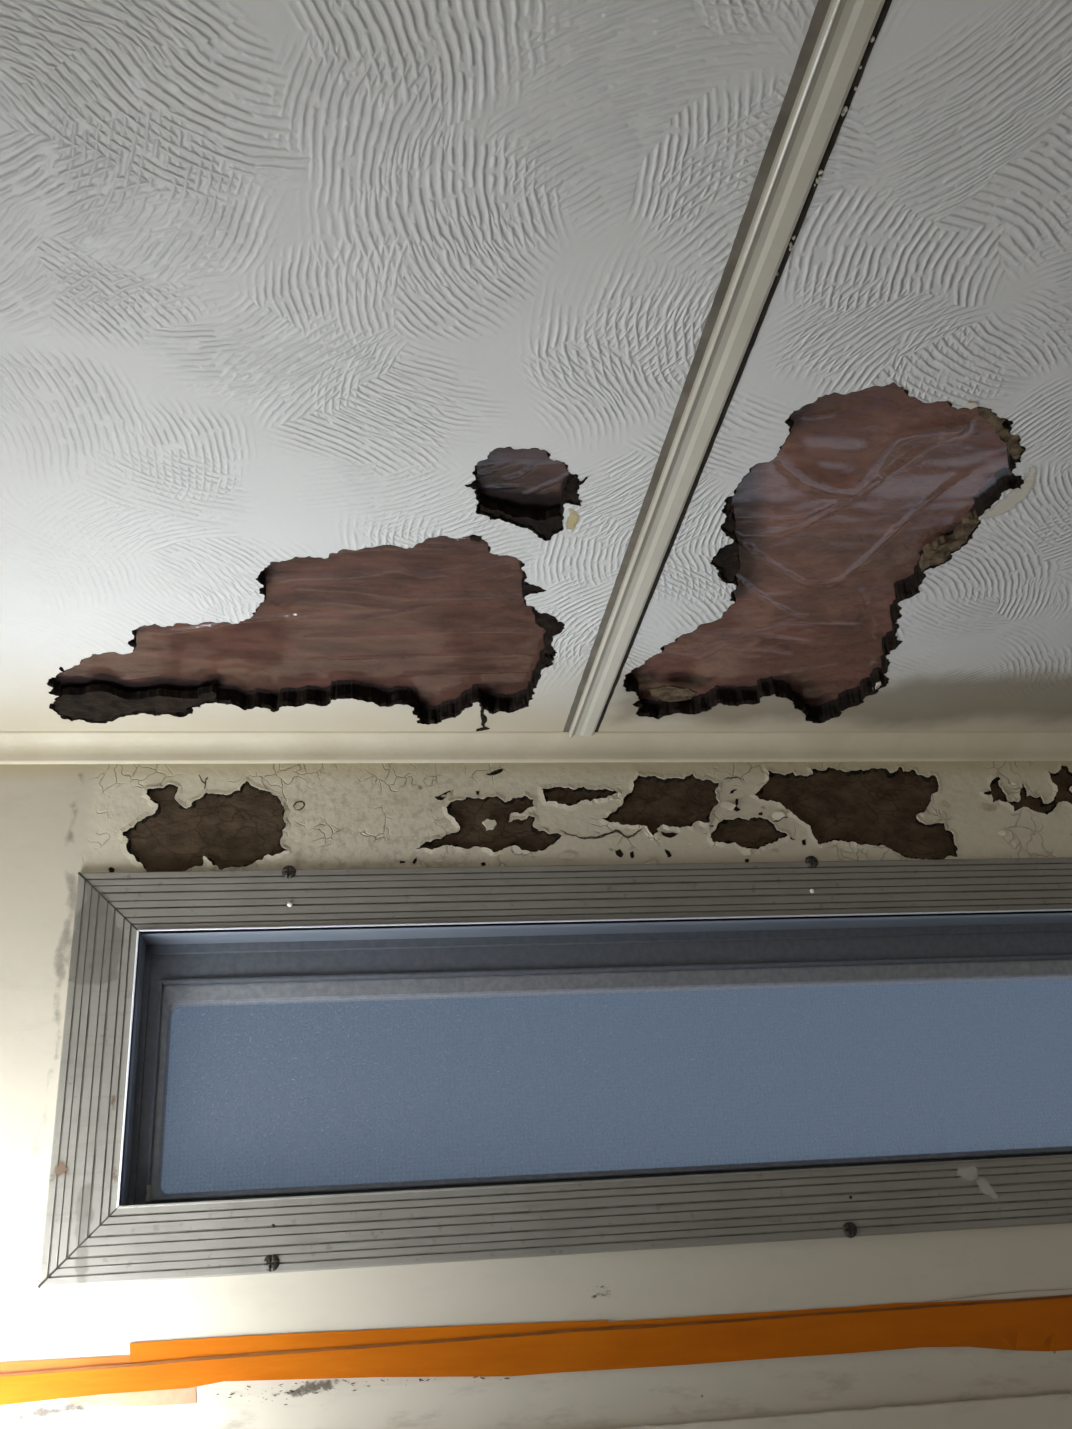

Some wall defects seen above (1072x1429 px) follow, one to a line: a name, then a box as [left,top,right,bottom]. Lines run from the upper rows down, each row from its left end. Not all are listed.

peeling [963,402,1024,460]
peeling [479,473,581,538]
peeling [713,497,740,582]
peeling [919,510,980,572]
peeling [521,578,564,665]
peeling [54,684,217,721]
peeling [650,685,697,702]
peeling [108,776,291,872]
peeling [400,763,963,866]
peeling [979,762,1072,819]